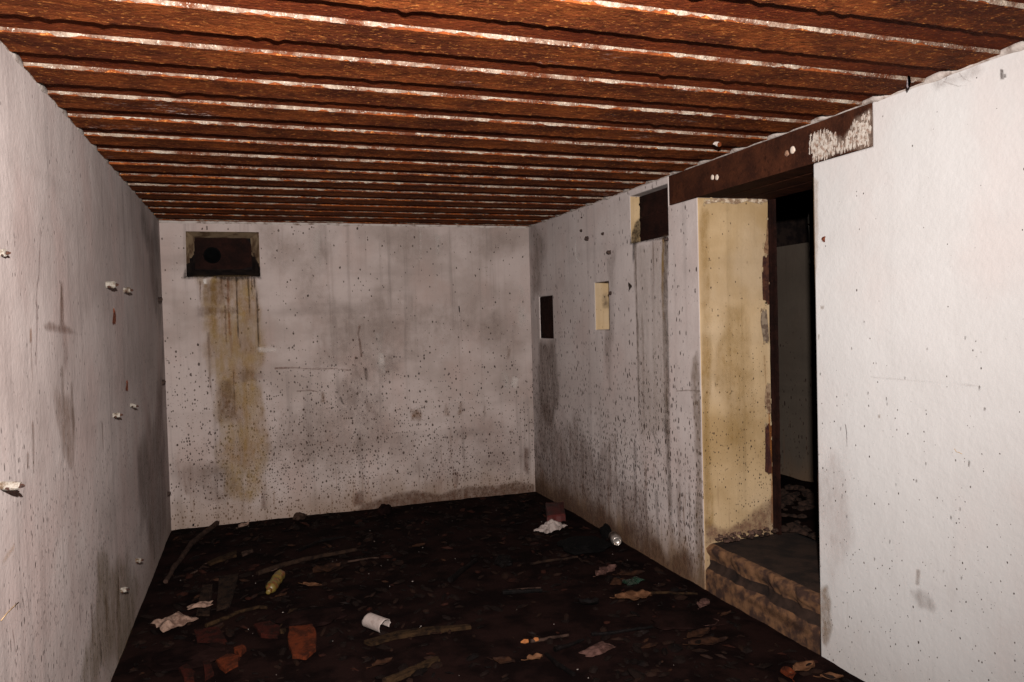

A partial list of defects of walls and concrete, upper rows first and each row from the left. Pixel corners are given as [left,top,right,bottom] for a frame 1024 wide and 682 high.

rust [205,280,263,419]
damp [356,483,692,579]